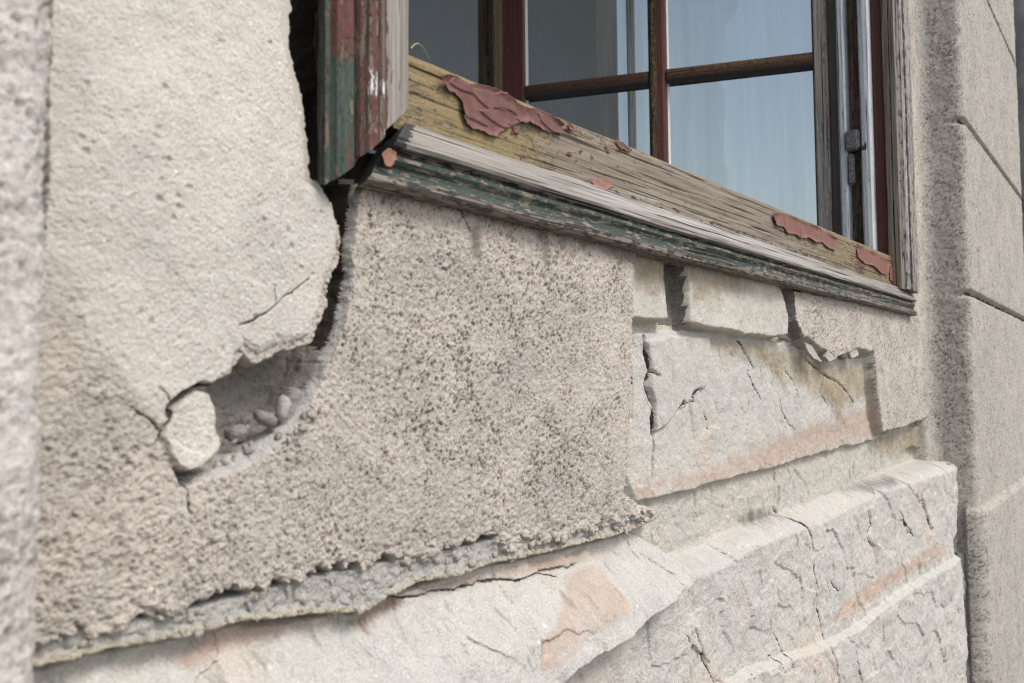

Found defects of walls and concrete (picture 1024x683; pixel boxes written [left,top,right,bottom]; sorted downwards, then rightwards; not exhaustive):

peeling [441,74,594,161]
peeling [382,148,397,167]
peeling [773,212,838,251]
peeling [853,248,893,282]
crack [244,279,308,324]
flaking render [161,184,362,489]
crack [131,383,210,446]
crack [631,344,656,429]
crack [737,340,854,430]
flaking render [32,499,659,667]
crack [390,564,573,599]
crack [685,631,714,682]